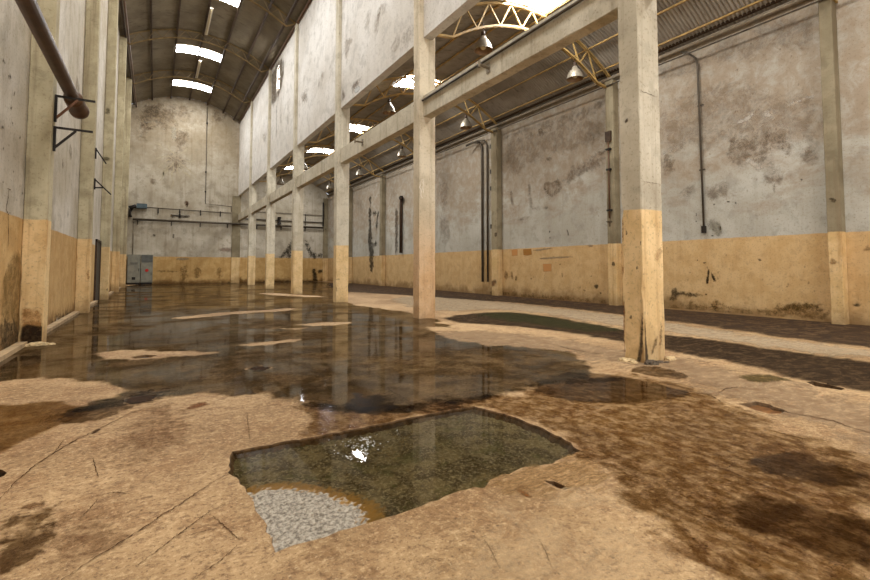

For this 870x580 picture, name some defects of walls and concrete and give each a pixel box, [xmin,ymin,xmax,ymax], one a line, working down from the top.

damp [368,196,379,272]
damp [670,288,698,310]
damp [742,303,825,319]
crack [4,403,158,494]
spalling [228,406,608,553]
damp [305,366,870,580]
spalling [741,402,788,413]
crack [61,473,237,580]